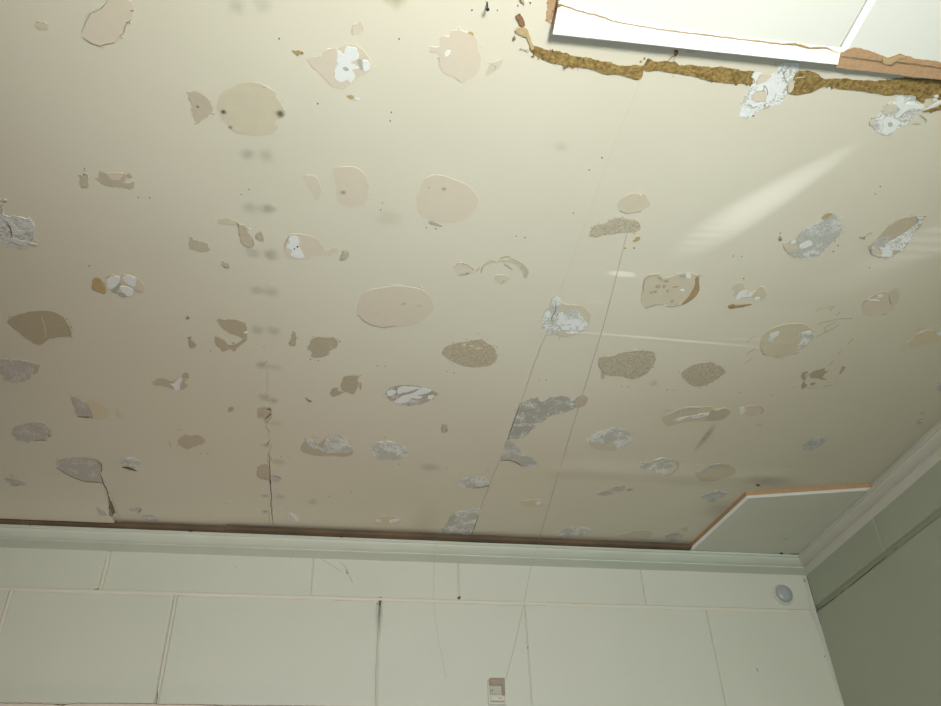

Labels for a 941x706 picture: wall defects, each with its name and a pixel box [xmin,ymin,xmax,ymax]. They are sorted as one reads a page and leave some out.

peeling [293,20,377,100]
peeling [881,95,939,135]
peeling [859,215,927,260]
peeling [641,273,702,309]
peeling [442,338,499,368]
peeling [598,349,657,379]
crack [263,362,273,522]